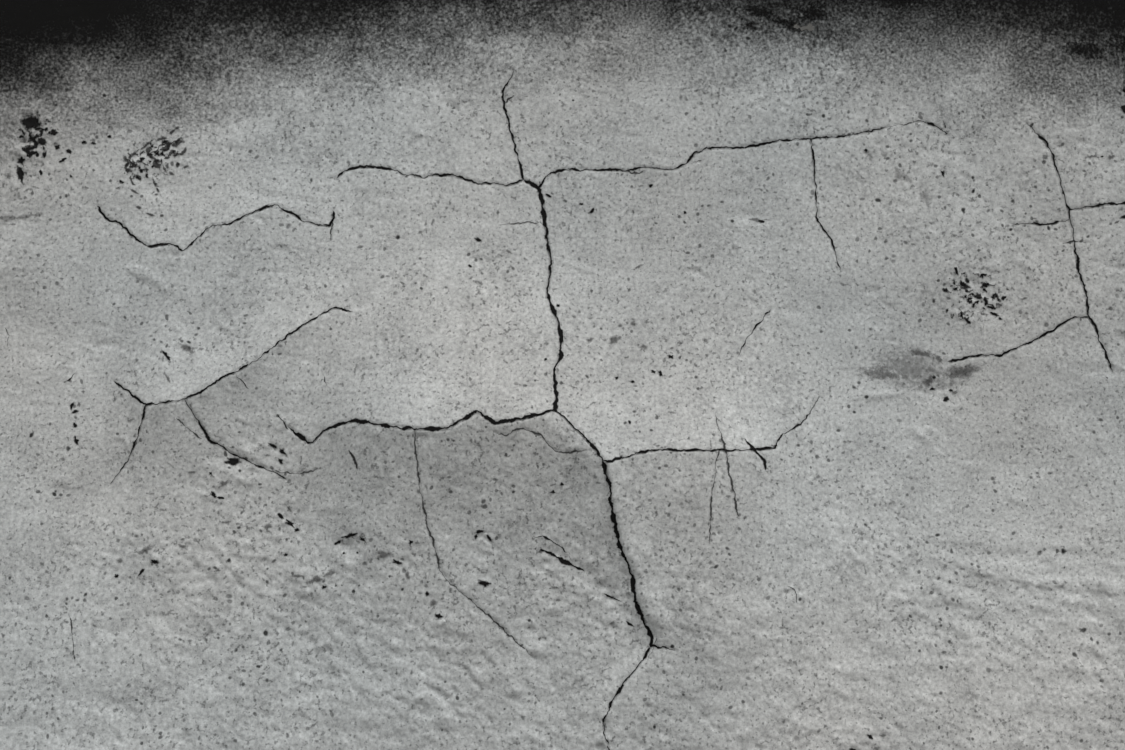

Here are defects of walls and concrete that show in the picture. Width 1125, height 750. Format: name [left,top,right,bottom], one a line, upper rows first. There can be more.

crack [97,71,947,750]
crack [948,126,1125,372]